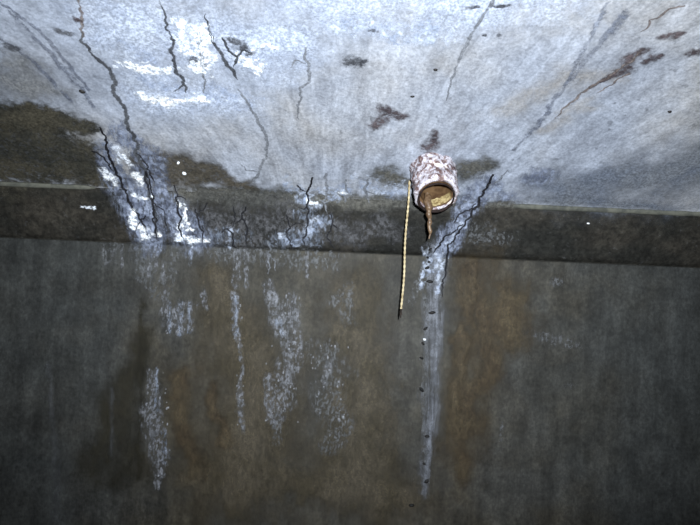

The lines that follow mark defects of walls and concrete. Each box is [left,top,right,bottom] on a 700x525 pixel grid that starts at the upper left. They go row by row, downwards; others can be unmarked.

damp [27,26,95,107]
crack [77,0,208,243]
crack [160,4,269,184]
rust [370,105,408,130]
damp [527,9,628,137]
rust [593,48,664,87]
crack [222,205,248,249]
crack [286,173,374,249]
crack [433,170,508,298]
damp [522,145,700,211]
damp [0,39,516,525]